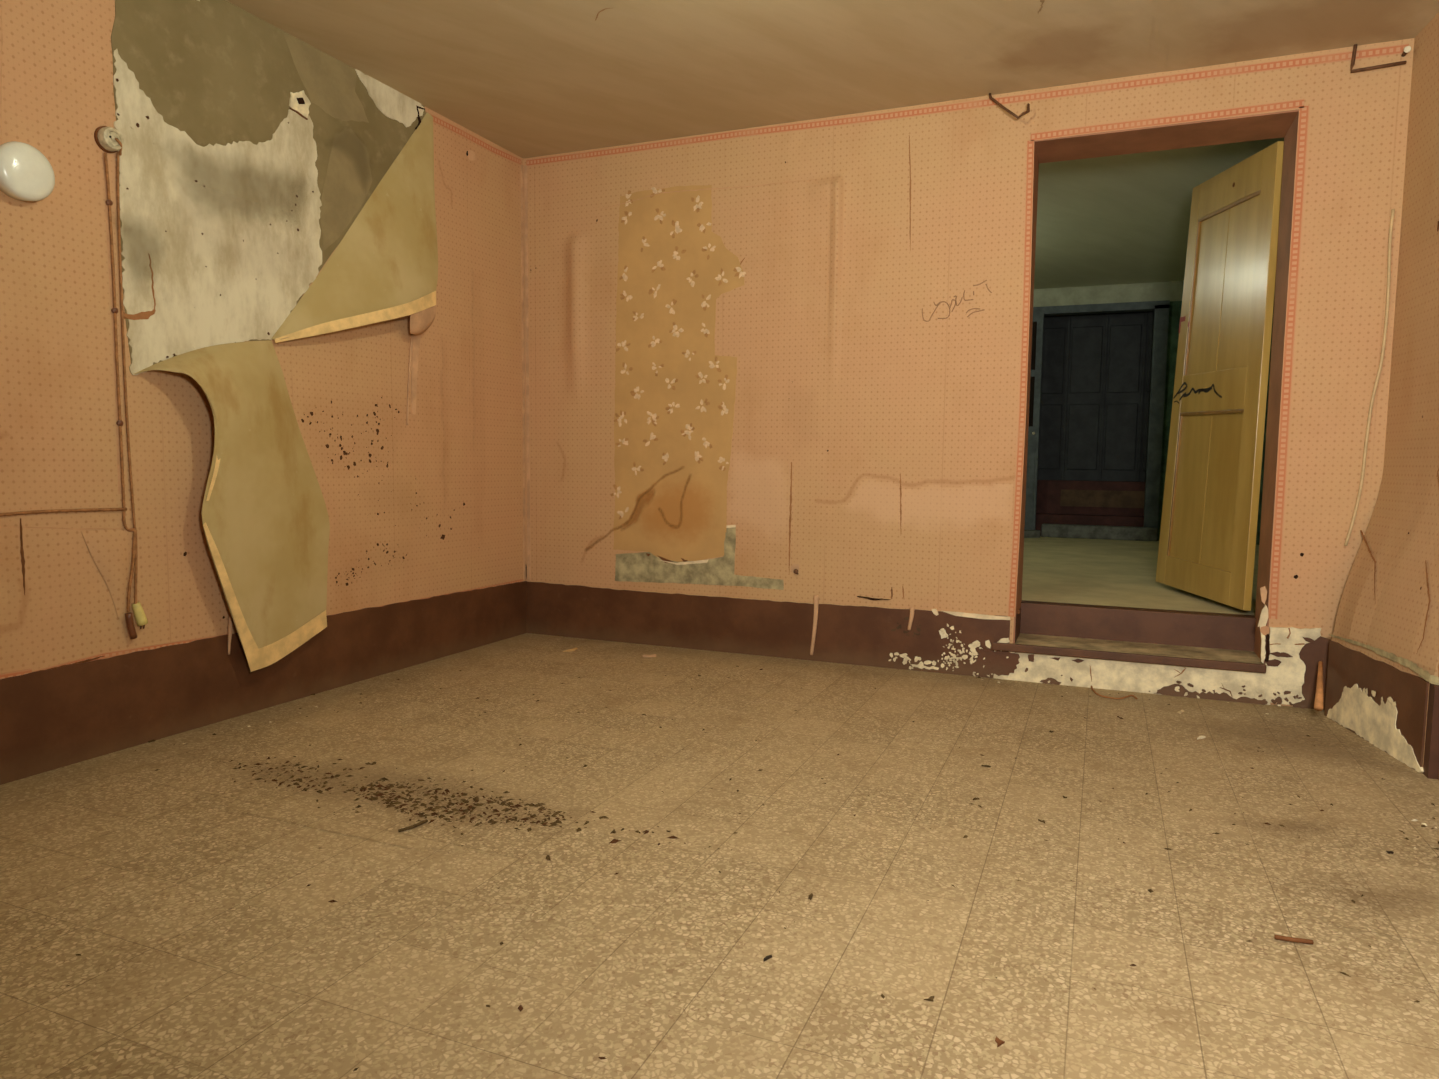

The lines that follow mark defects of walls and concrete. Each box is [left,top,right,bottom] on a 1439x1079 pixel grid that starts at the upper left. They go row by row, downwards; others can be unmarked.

flaking render [111,0,426,375]
flaking render [615,525,784,590]
peeling [888,611,1084,685]
flaking render [1149,627,1439,709]
peeling [1327,684,1424,773]